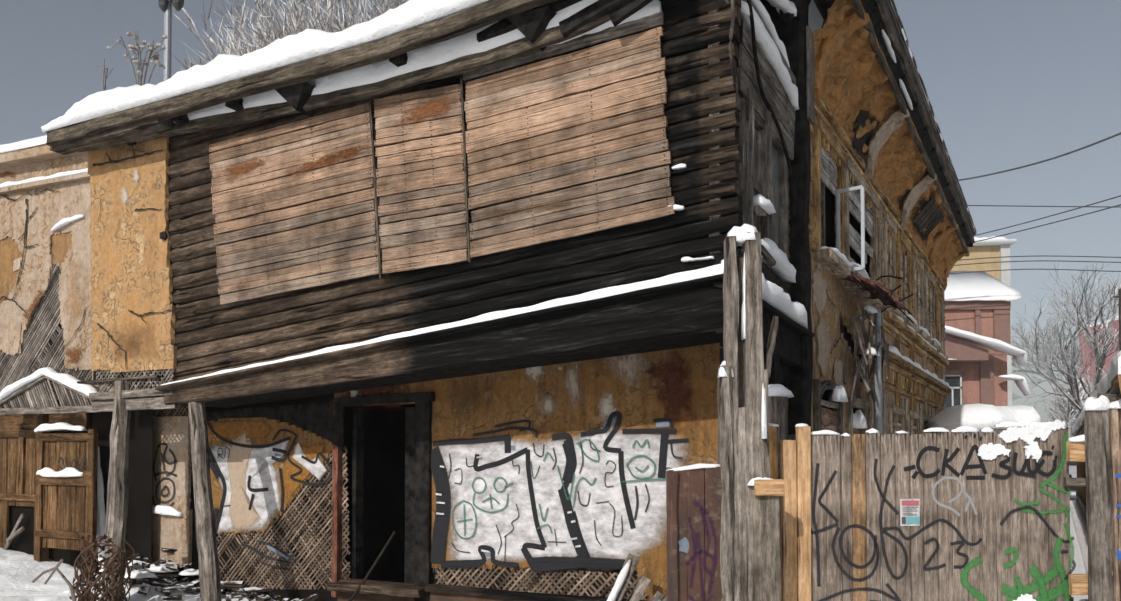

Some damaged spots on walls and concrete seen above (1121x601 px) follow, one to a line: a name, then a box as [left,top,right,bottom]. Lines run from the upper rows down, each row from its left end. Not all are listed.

crack [93,145,162,167]
flaking render [869,112,903,166]
flaking render [903,179,930,222]
flaking render [0,232,92,393]
crack [63,308,126,366]
crack [128,309,172,323]
peeling [812,269,845,388]